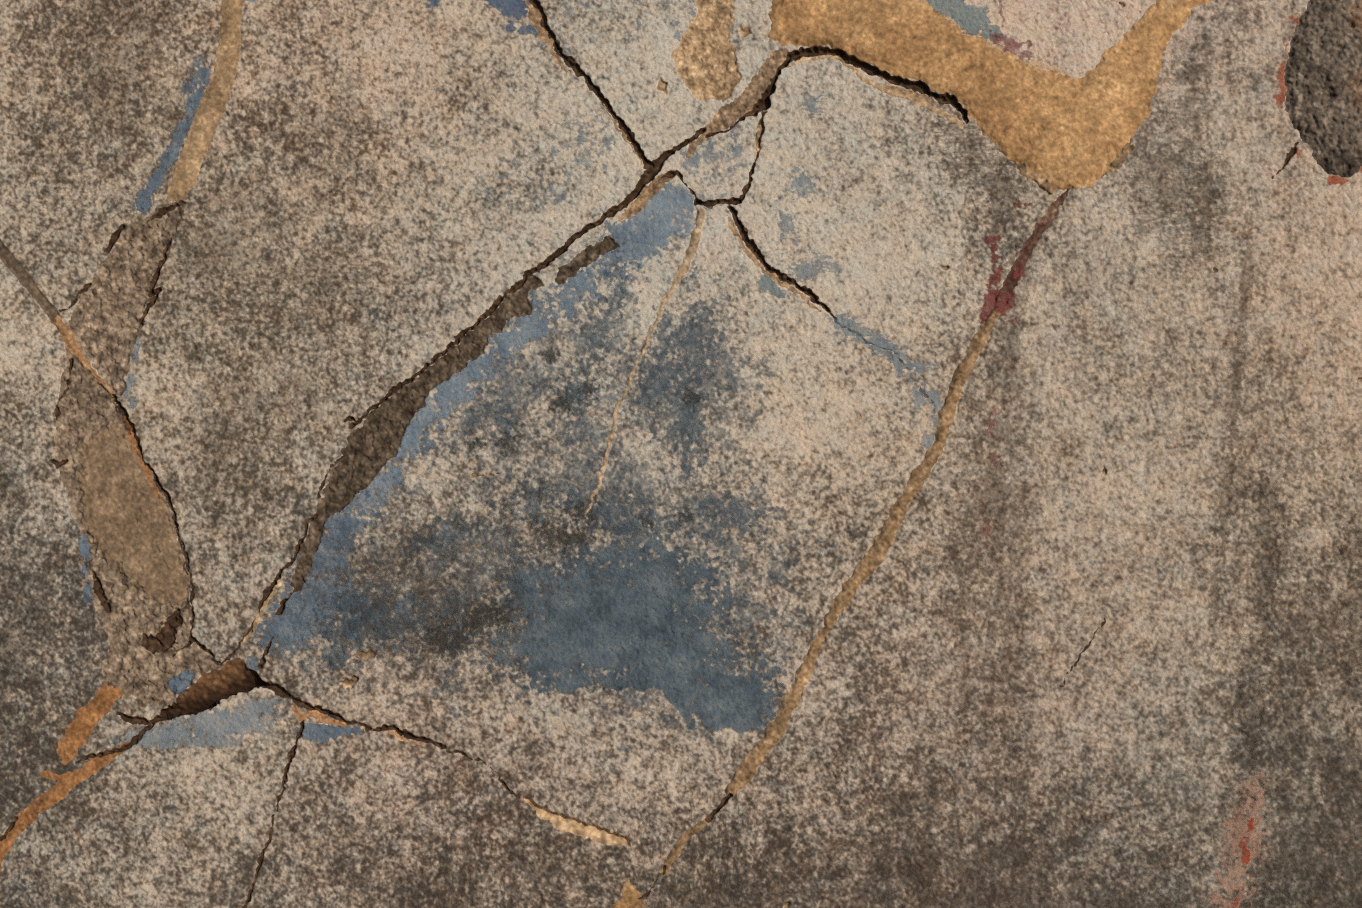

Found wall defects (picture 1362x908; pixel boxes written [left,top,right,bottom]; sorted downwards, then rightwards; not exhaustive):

crack [54,358,74,420]
spalling [54,0,796,750]
crack [103,0,969,908]
crack [1271,142,1299,179]